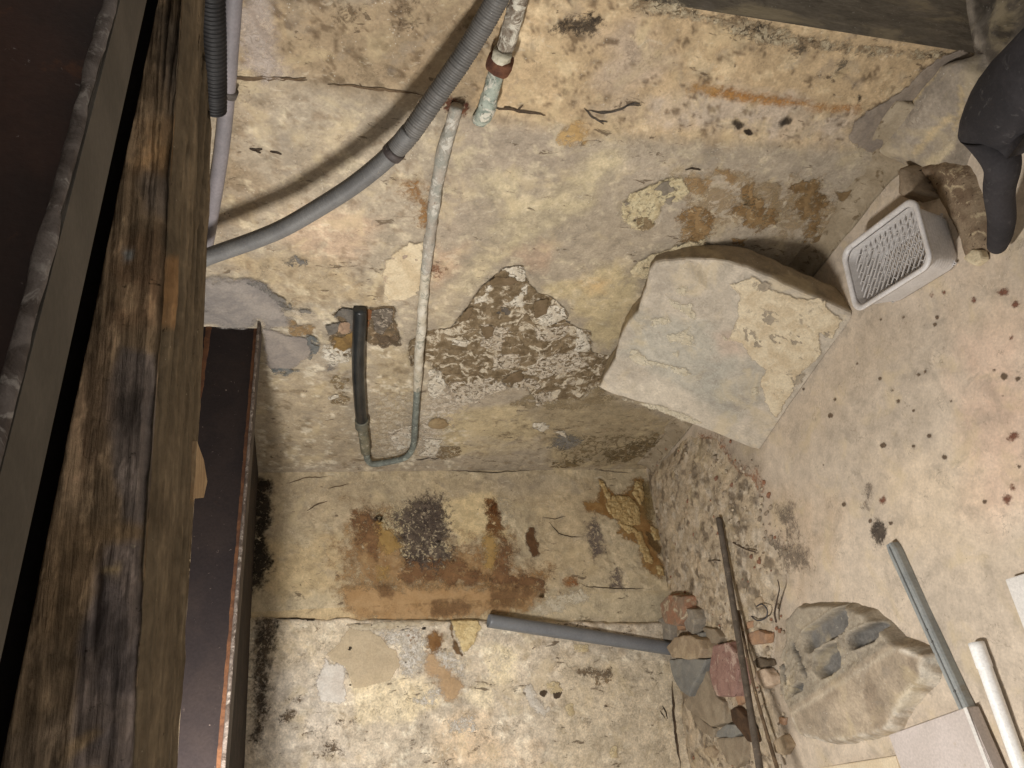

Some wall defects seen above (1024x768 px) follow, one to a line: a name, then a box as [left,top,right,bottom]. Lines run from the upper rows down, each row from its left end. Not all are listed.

crack [237,76,424,96]
rust [694,85,857,113]
peeling [620,177,689,232]
spalling [325,308,353,357]
flaking render [365,265,609,405]
water stain [365,488,456,575]